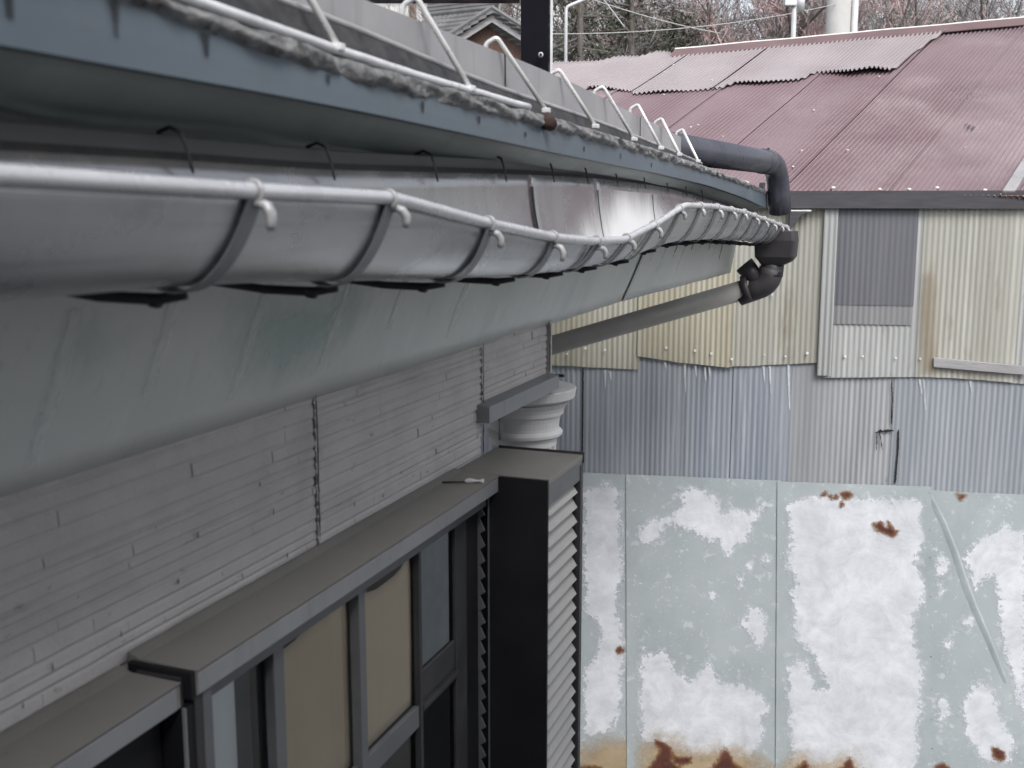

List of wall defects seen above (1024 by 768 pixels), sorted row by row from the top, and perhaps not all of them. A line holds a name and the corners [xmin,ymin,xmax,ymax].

rust [821,491,854,508]
rust [872,521,899,538]
water stain [582,481,770,761]
water stain [636,486,1024,768]
rust [580,740,769,768]
rust [991,747,1006,761]